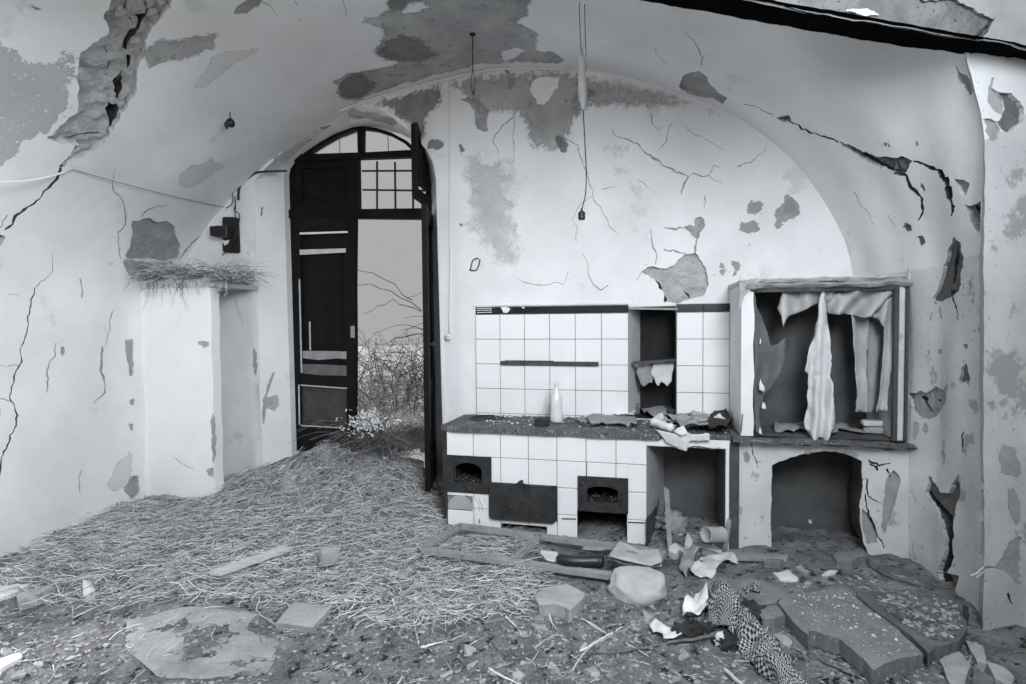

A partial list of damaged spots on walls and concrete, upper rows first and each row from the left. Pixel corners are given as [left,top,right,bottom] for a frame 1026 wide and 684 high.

flaking render [746,0,994,41]
flaking render [0,0,171,168]
crack [744,104,838,142]
flaking render [955,66,1024,141]
crack [613,113,766,281]
crack [854,160,955,227]
flaking render [643,253,709,304]
flaking render [932,237,964,302]
crack [0,254,53,474]
crack [45,344,56,394]
crack [93,311,113,404]
flaking render [925,475,1023,588]